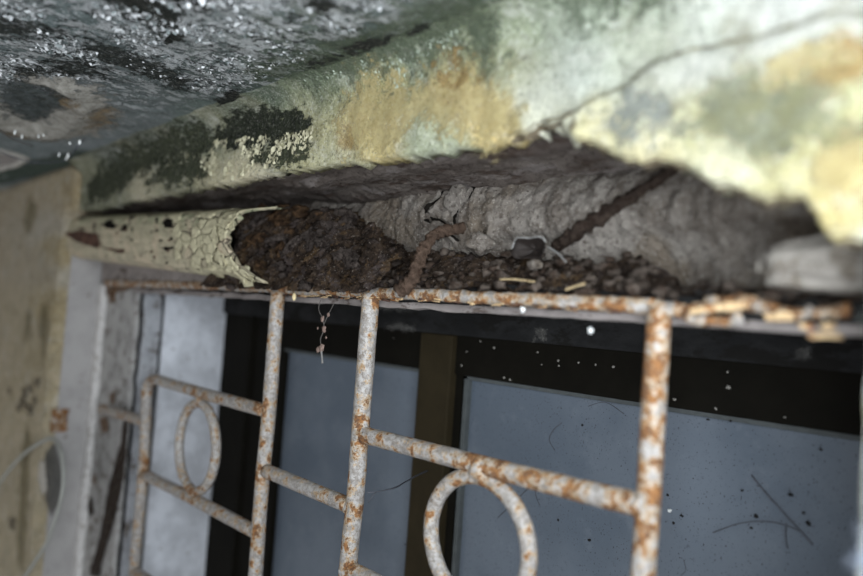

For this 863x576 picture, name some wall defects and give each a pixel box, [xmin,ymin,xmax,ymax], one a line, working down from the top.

mould [105,0,212,46]
mould [304,0,339,14]
mould [297,23,431,69]
crack [548,10,863,123]
spalling [0,149,30,171]
mould [0,15,315,211]
spalling [66,110,863,295]
water stain [603,69,863,161]